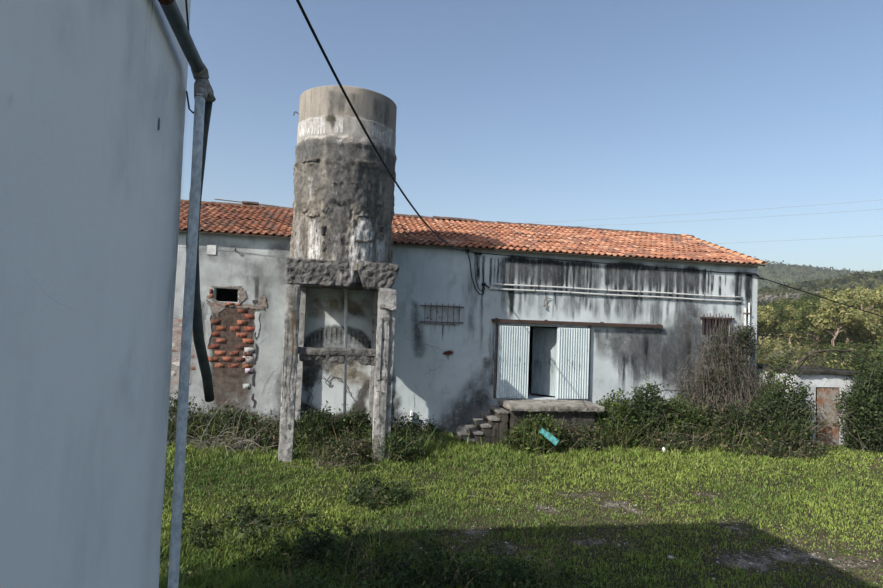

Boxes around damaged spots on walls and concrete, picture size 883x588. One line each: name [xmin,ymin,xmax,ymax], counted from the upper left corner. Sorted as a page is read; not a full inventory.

peeling [299,117,326,138]
peeling [297,125,392,262]
spalling [205,286,267,418]
water stain [414,304,423,354]
water stain [434,374,492,435]
water stain [476,256,754,414]